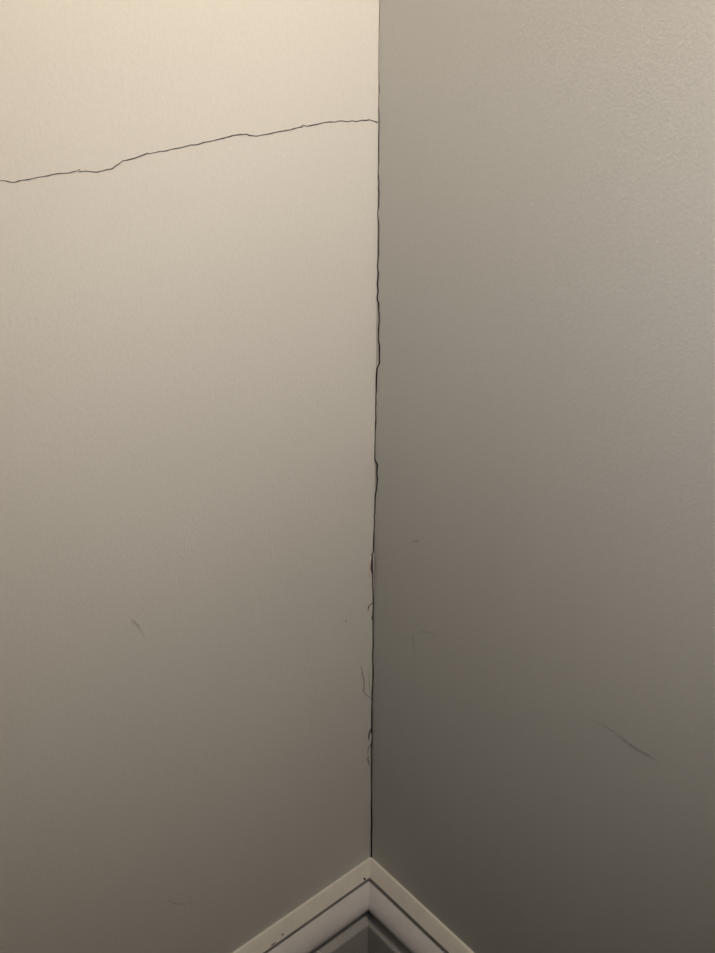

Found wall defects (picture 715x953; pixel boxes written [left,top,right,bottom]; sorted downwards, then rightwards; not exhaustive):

crack [0,42,380,858]